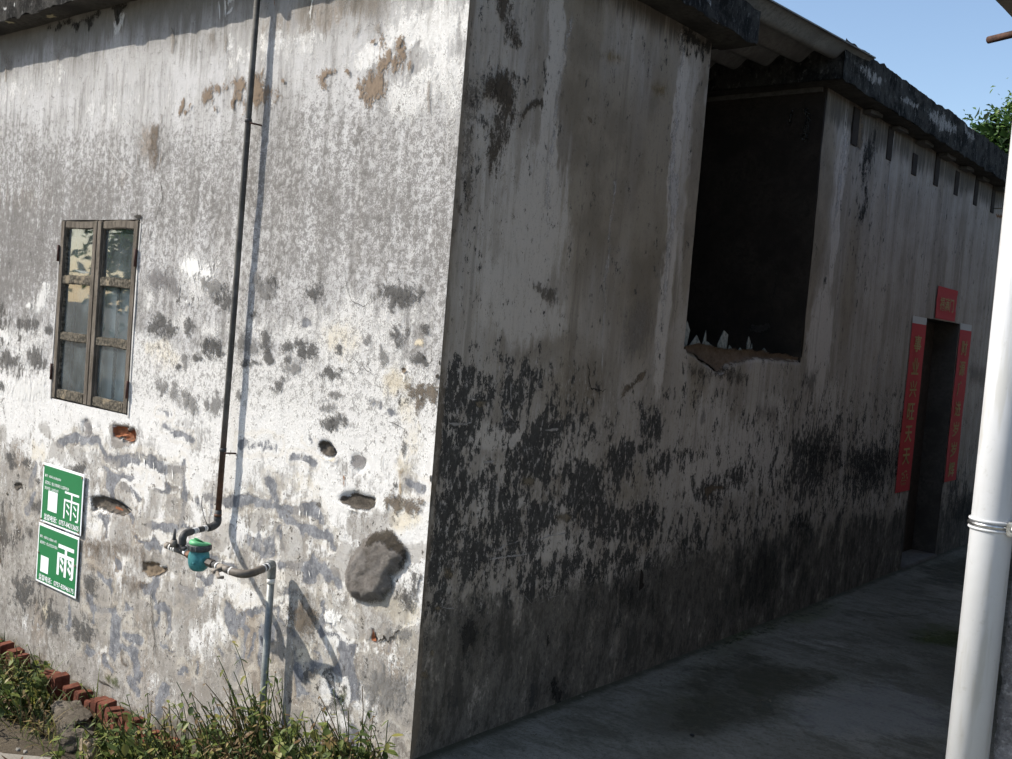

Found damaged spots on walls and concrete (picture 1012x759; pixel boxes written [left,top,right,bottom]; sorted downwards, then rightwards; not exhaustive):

water stain [497,0,523,50]
peeling [177,69,284,115]
peeling [316,33,417,110]
water stain [478,55,544,186]
water stain [4,449,39,484]
spalling [109,421,140,449]
spalling [318,441,335,462]
spalling [89,495,131,516]
spalling [338,493,376,512]
water stain [11,570,41,617]
water stain [41,568,98,649]
water stain [283,589,345,646]